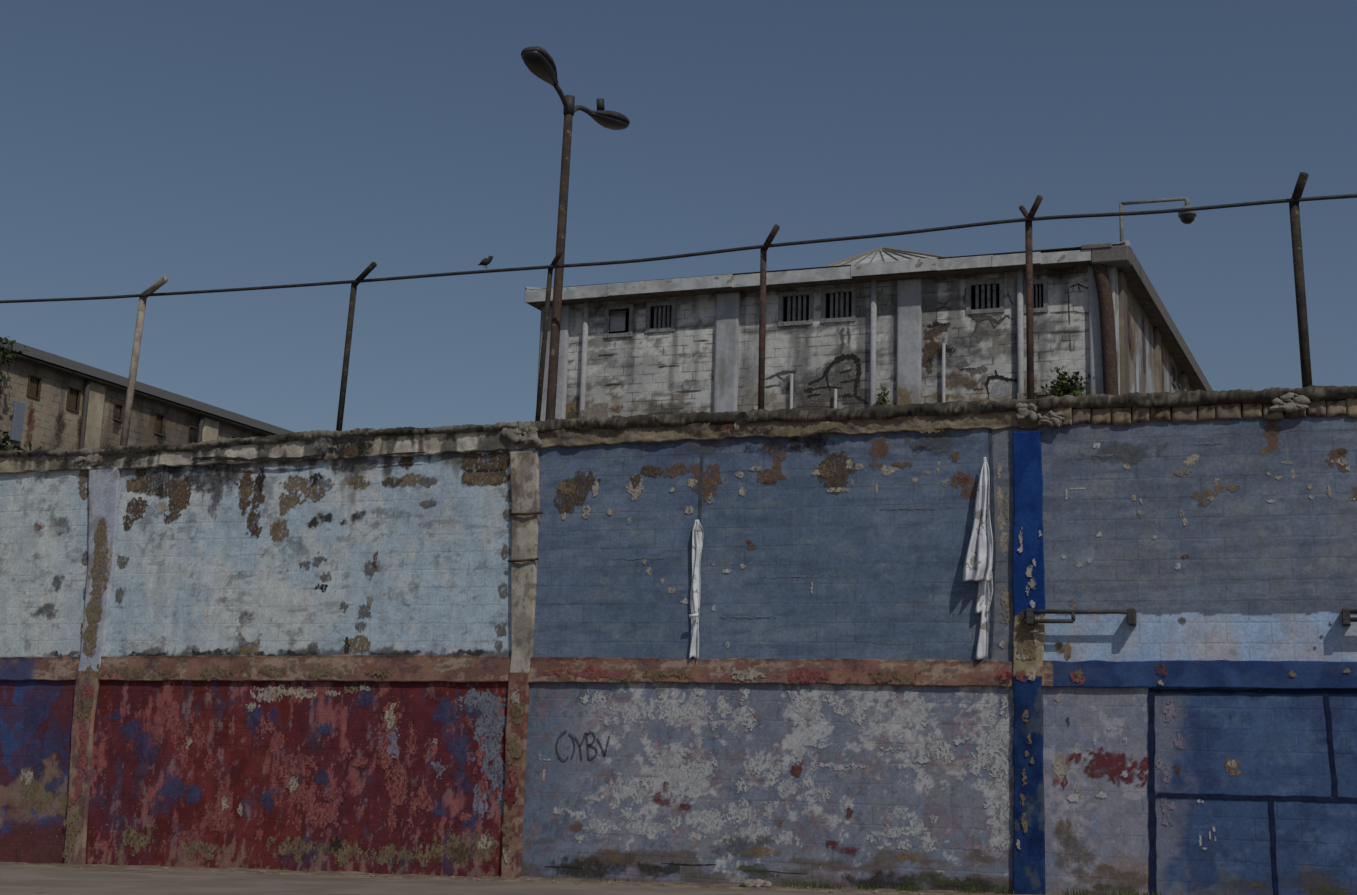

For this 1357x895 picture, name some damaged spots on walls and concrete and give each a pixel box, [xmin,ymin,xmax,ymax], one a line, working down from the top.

leakage [565,396,580,419]
leakage [779,328,866,409]
leakage [930,316,1007,402]
peeling [123,468,192,531]
peeling [234,434,438,541]
peeling [626,451,787,514]
peeling [875,451,978,500]
peeling [20,470,180,865]
peeling [197,551,525,868]
peeling [544,663,766,732]
peeling [785,464,1039,854]
peeling [553,742,866,848]